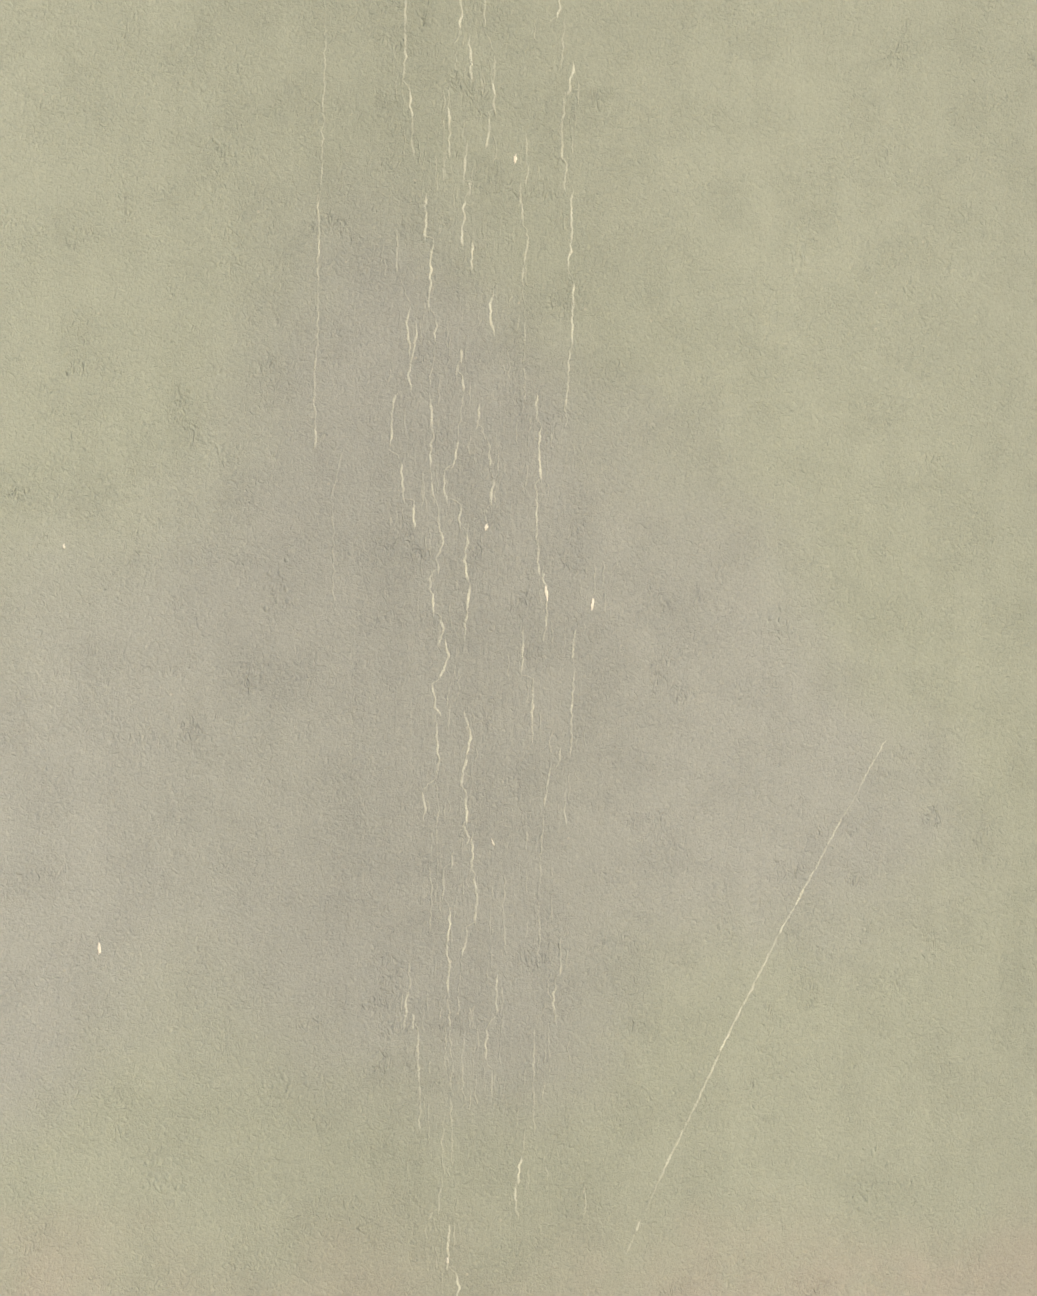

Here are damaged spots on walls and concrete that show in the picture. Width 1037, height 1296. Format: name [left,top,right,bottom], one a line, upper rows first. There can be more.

crack [313,0,344,607]
crack [380,0,606,1296]